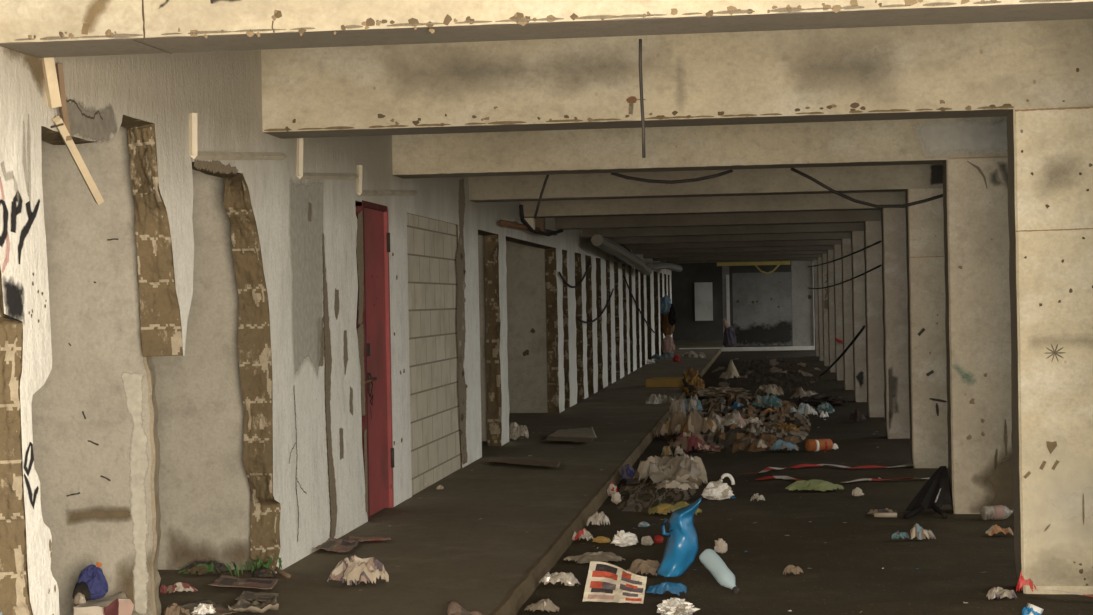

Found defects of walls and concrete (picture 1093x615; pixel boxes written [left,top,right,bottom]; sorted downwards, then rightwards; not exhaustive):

spalling [361,18,395,30]
spalling [408,14,474,33]
spalling [509,12,556,26]
spalling [822,0,858,13]
spalling [57,100,182,356]
spalling [194,159,281,573]
spalling [0,287,31,615]
leakage [976,419,1059,510]